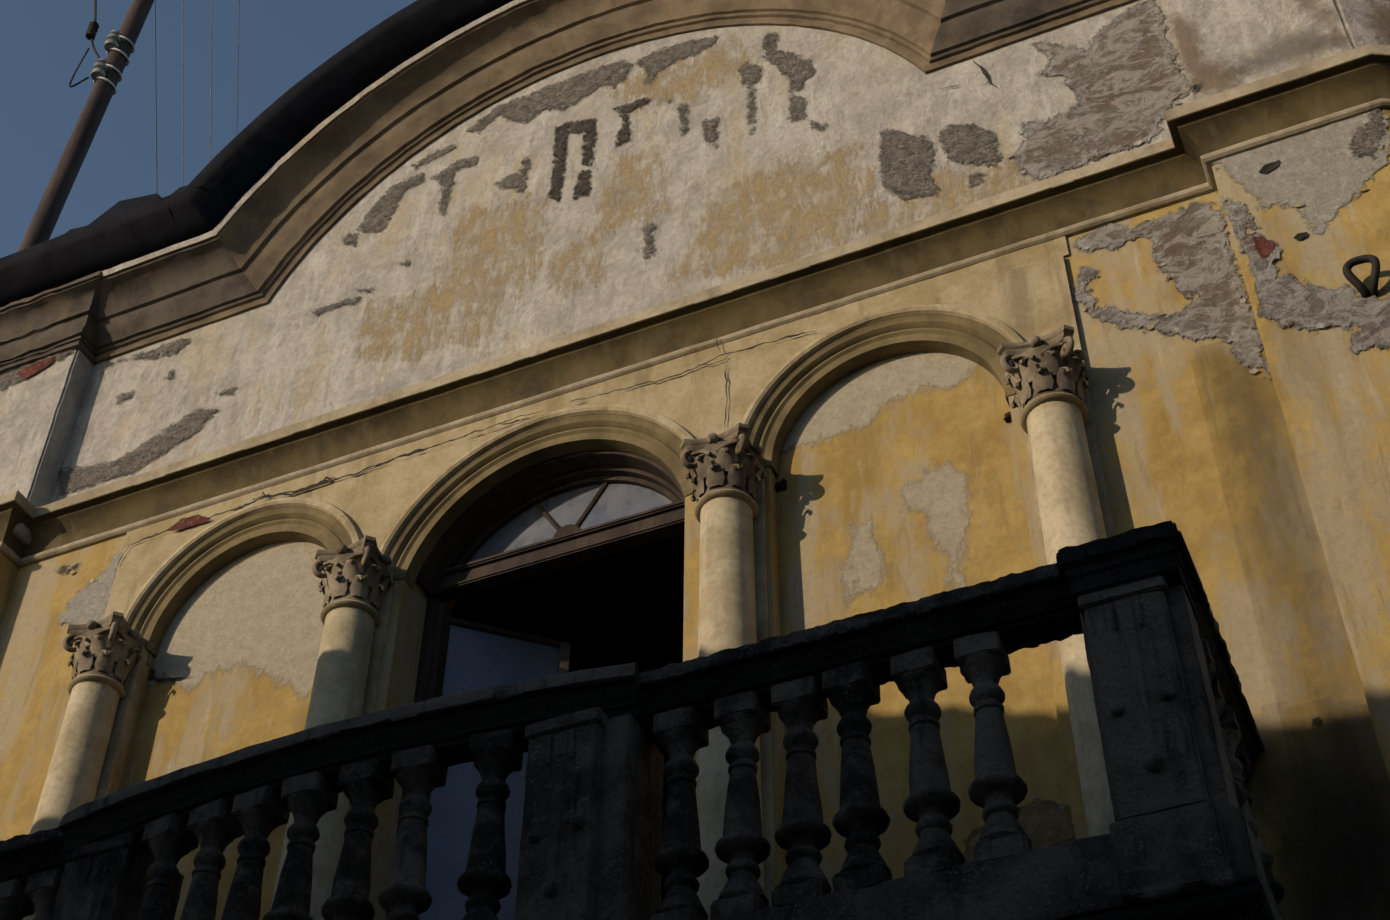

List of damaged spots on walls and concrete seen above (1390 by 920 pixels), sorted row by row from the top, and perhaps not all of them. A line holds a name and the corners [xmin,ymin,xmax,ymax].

flaking render [466,35,719,203]
flaking render [737,32,829,135]
flaking render [877,0,1201,201]
flaking render [341,145,479,247]
flaking render [641,223,656,258]
flaking render [1068,108,1390,380]
flaking render [312,286,375,316]
flaking render [0,349,74,392]
flaking render [113,337,190,380]
flaking render [58,387,238,496]
crack [208,331,817,518]
crack [118,530,168,564]